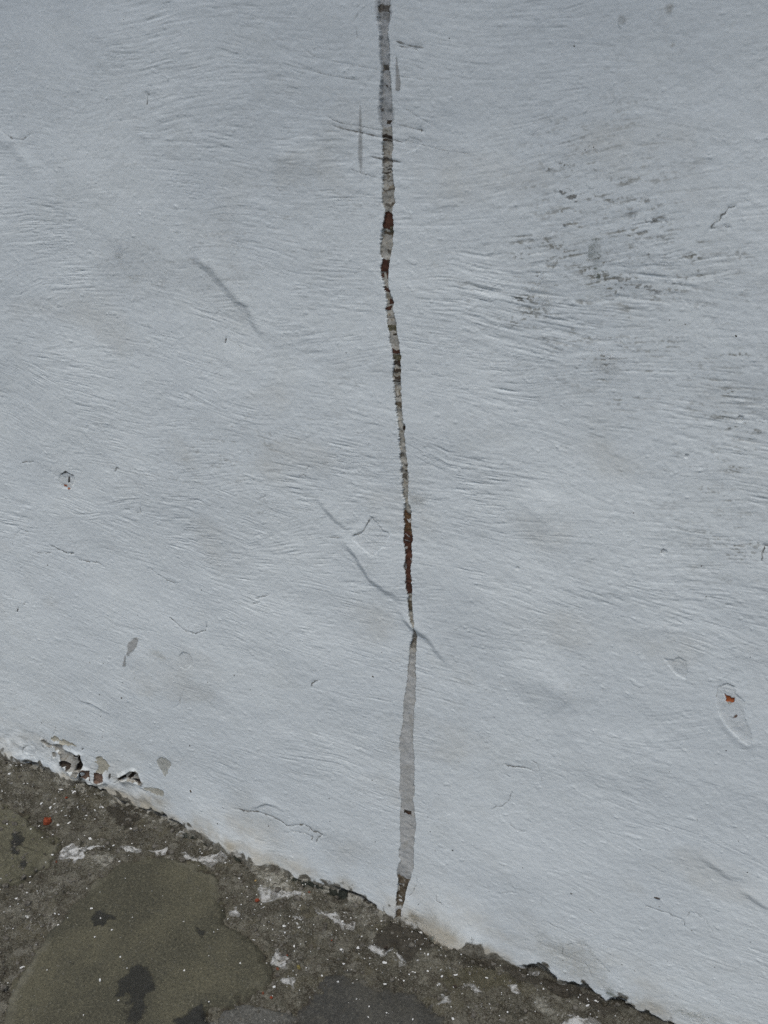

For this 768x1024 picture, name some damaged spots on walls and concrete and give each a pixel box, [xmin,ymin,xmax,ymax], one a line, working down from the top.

spalling [41,736,164,796]
crack [375,0,417,917]